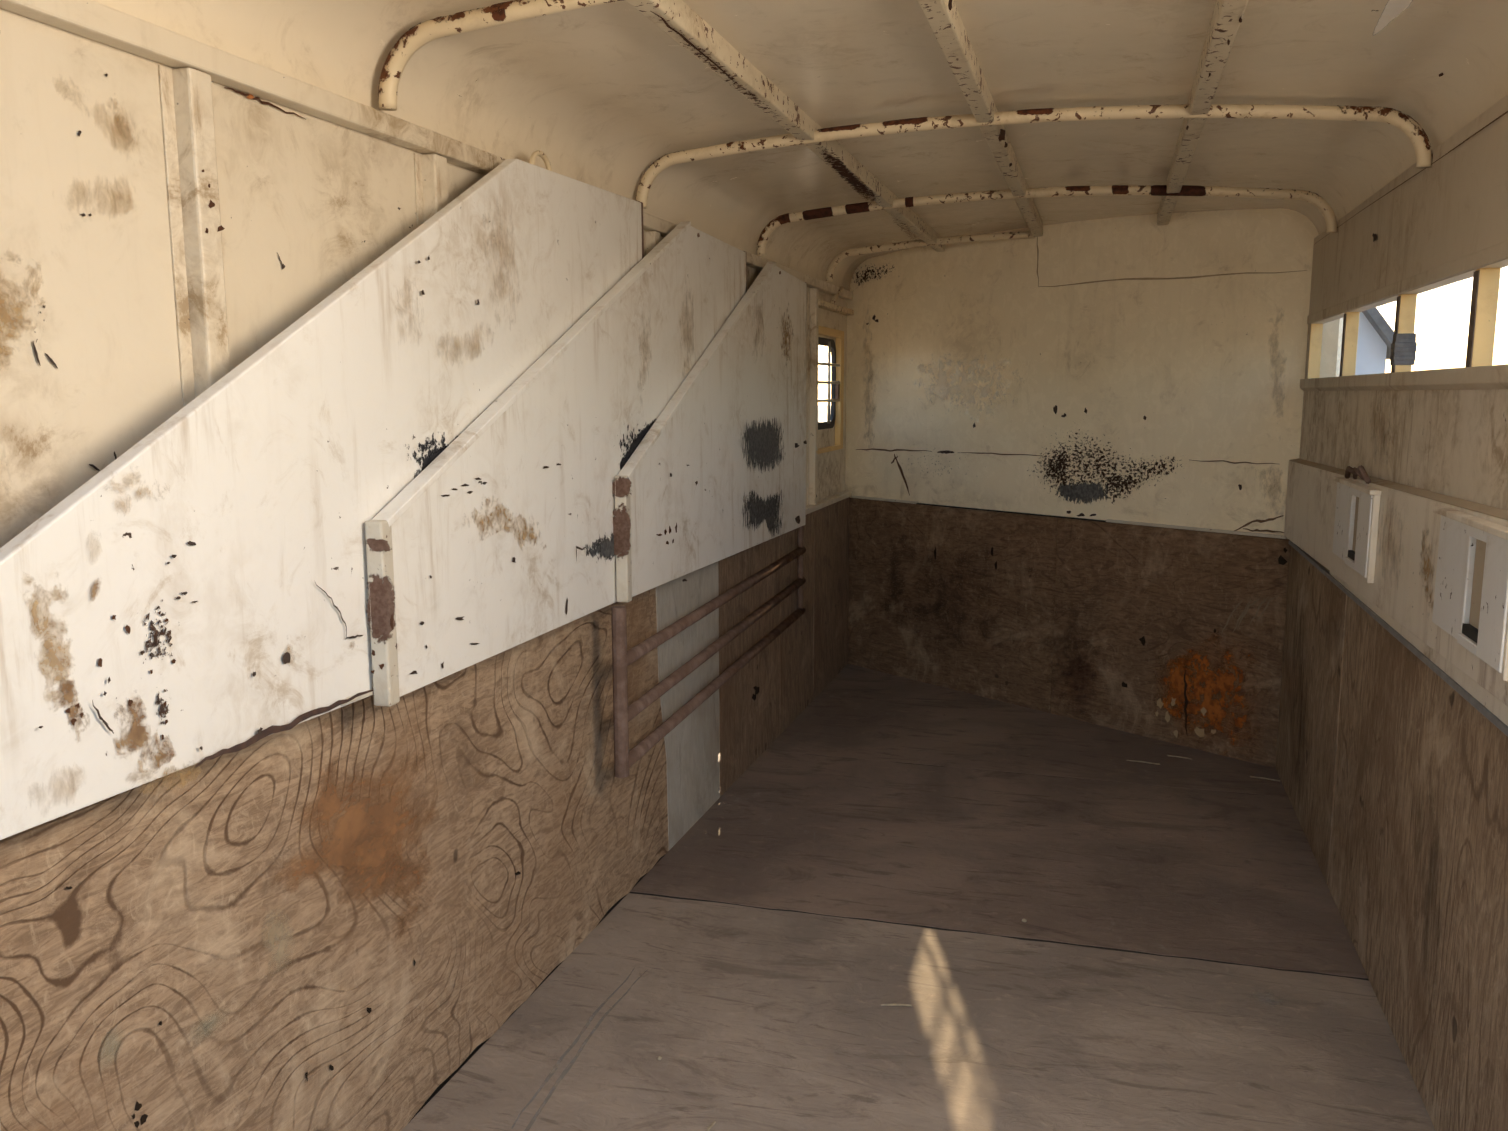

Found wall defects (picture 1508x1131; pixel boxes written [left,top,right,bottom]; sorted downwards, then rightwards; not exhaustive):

corrosion [378,0,536,95]
corrosion [651,11,783,119]
corrosion [882,117,928,126]
corrosion [366,538,391,552]
corrosion [612,476,632,559]
corrosion [366,574,396,674]
corrosion [1155,634,1258,756]